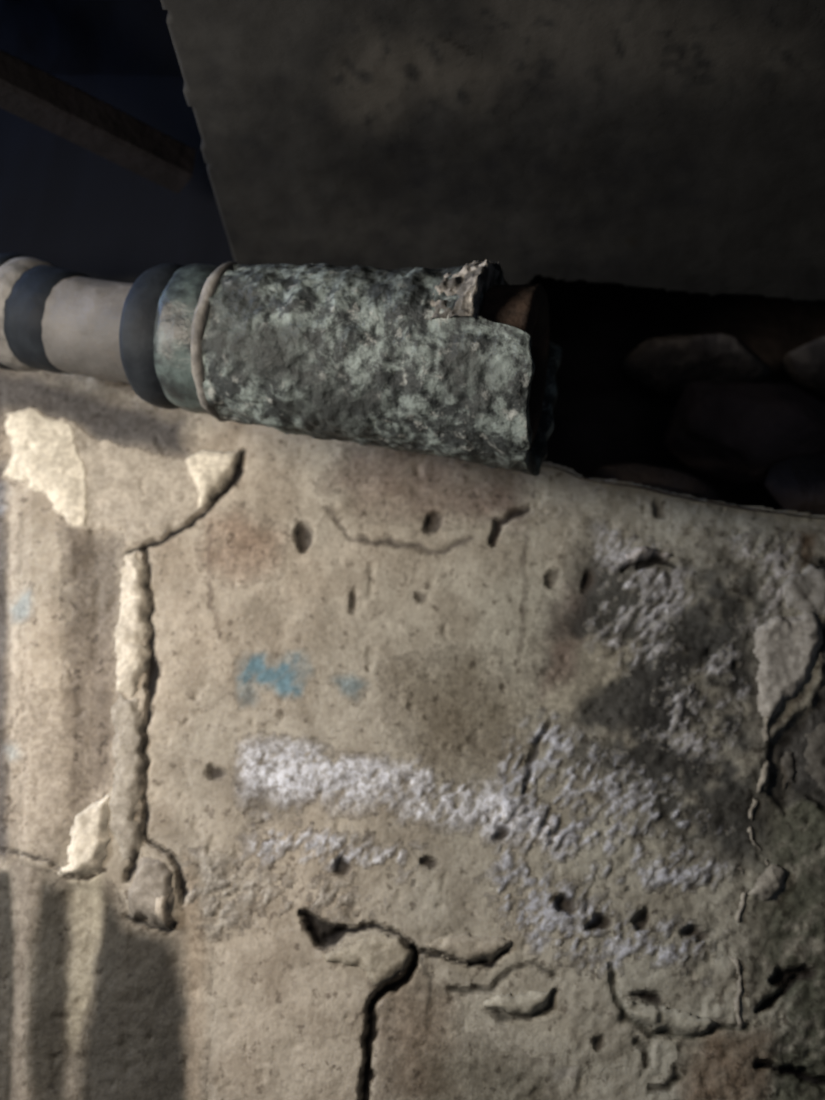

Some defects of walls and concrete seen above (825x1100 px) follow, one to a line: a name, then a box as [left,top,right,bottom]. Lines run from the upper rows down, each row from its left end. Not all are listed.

crack [621,551,680,573]
crack [0,446,247,936]
leakage [0,368,825,1100]
crack [297,909,562,1100]
crack [607,961,825,1095]